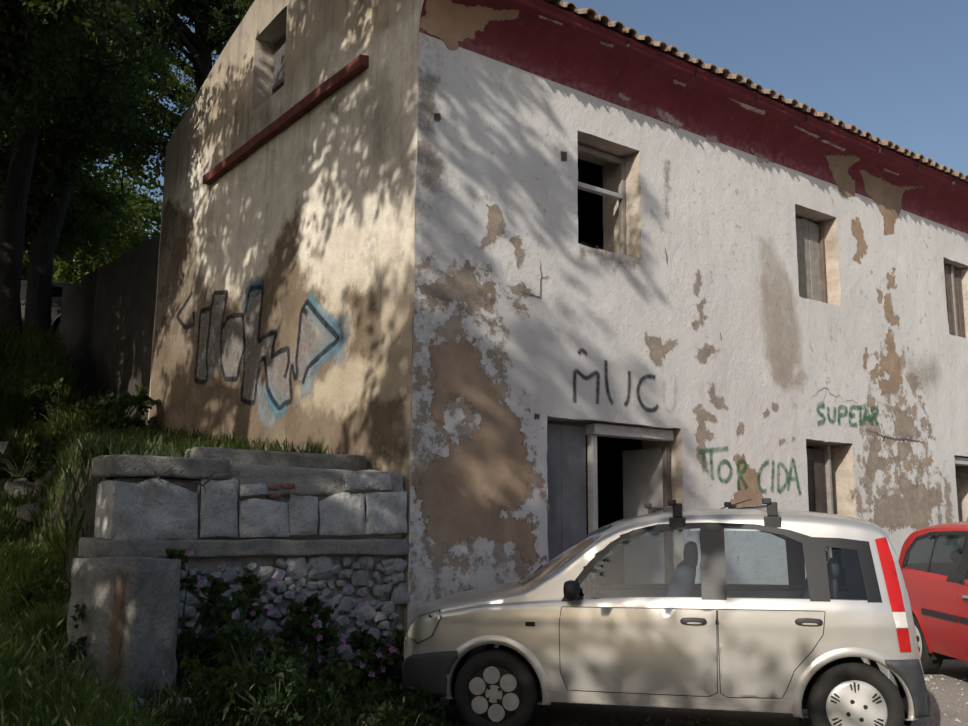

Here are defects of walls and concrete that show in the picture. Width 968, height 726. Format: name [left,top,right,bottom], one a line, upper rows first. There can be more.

spalling [420,0,520,50]
spalling [795,126,923,236]
spalling [479,204,525,267]
spalling [851,217,868,264]
damp [149,200,408,465]
spalling [645,332,677,366]
spalling [692,270,707,330]
spalling [696,344,719,364]
damp [762,276,803,387]
spalling [409,256,550,601]
spalling [693,384,728,473]
spalling [849,267,954,533]